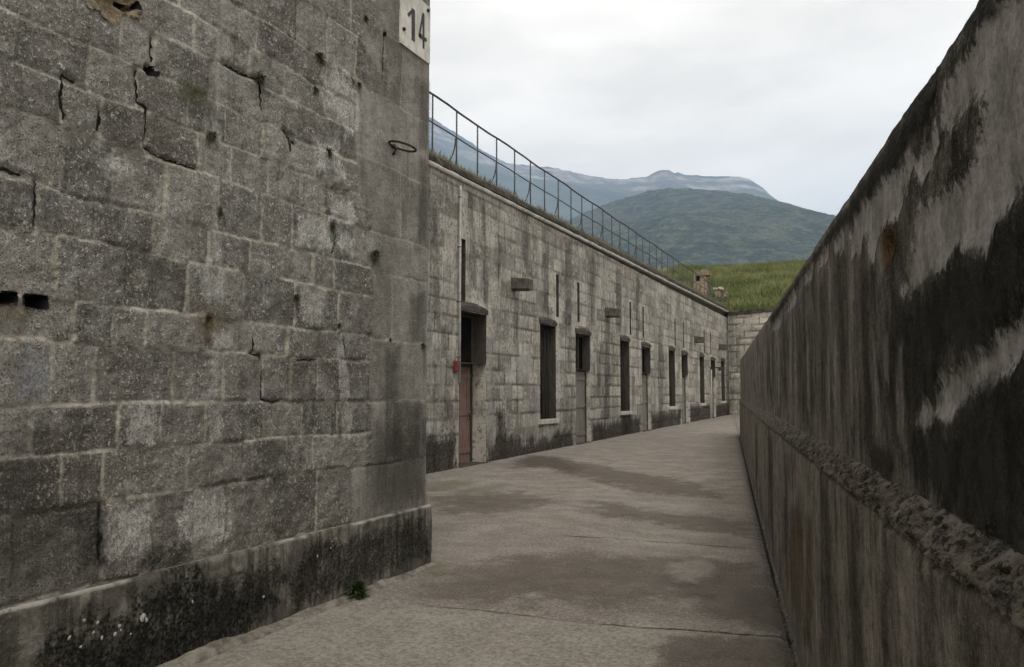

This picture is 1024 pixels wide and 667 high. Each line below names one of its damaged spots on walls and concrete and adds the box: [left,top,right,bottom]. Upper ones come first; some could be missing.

spalling [86,0,143,28]
crack [58,74,75,119]
crack [134,37,195,170]
crack [220,63,262,109]
crack [0,167,36,226]
leakage [770,41,961,322]
leakage [890,193,1024,555]
leakage [426,432,457,474]
leakage [486,340,767,540]
leakage [75,491,232,573]
mould [230,517,428,607]